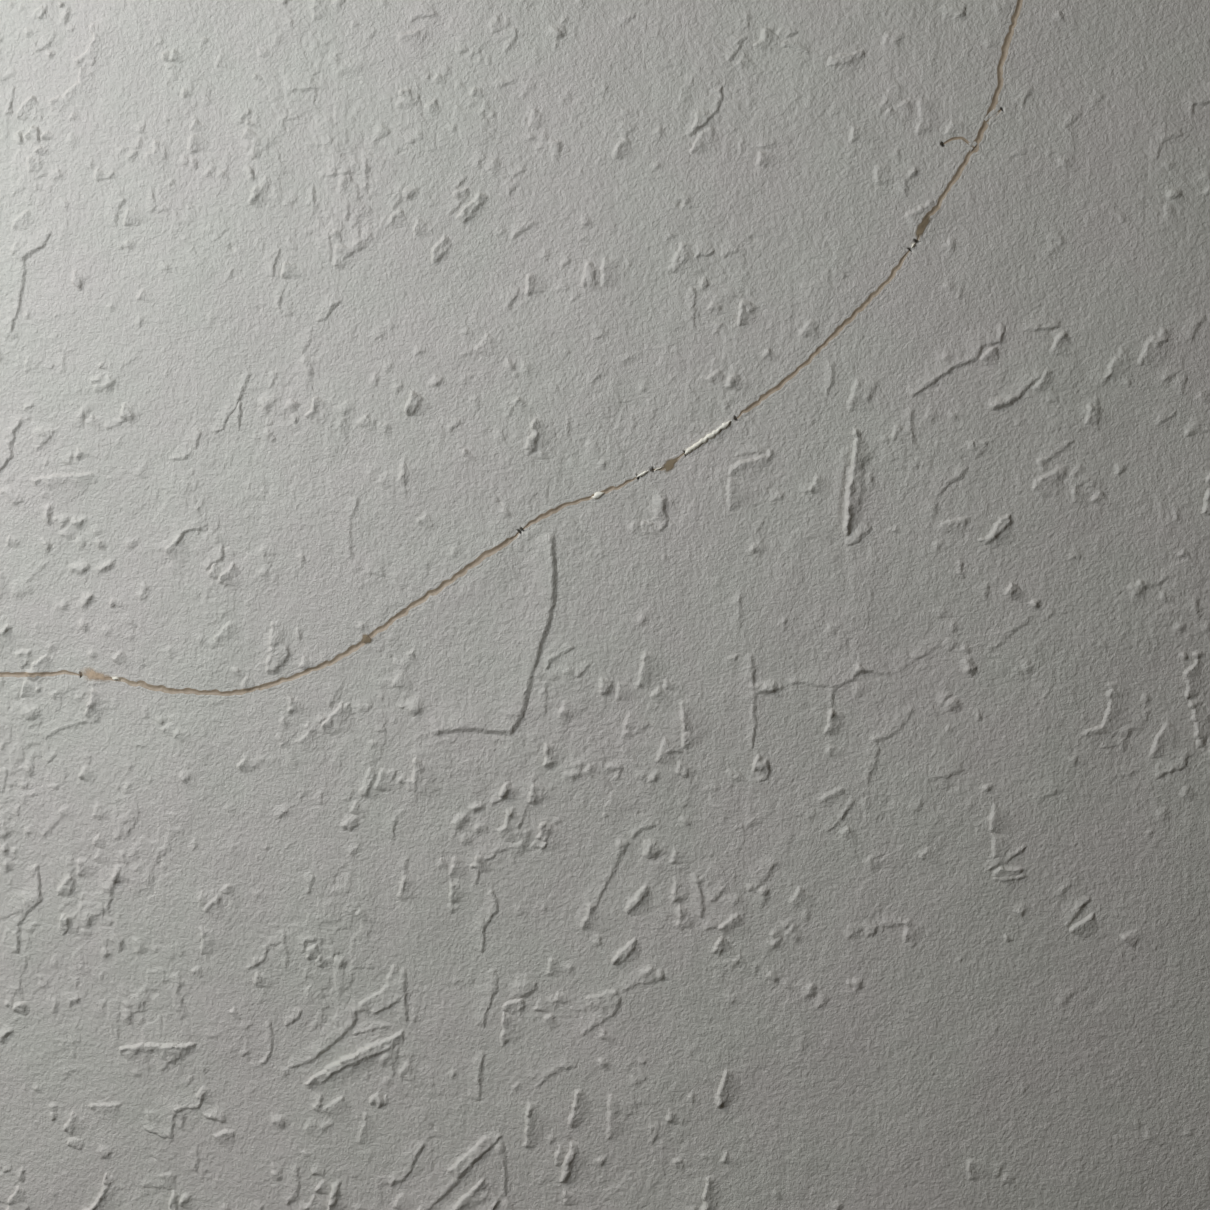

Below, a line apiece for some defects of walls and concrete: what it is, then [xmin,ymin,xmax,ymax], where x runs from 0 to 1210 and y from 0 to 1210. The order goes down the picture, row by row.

crack [0,0,1027,699]